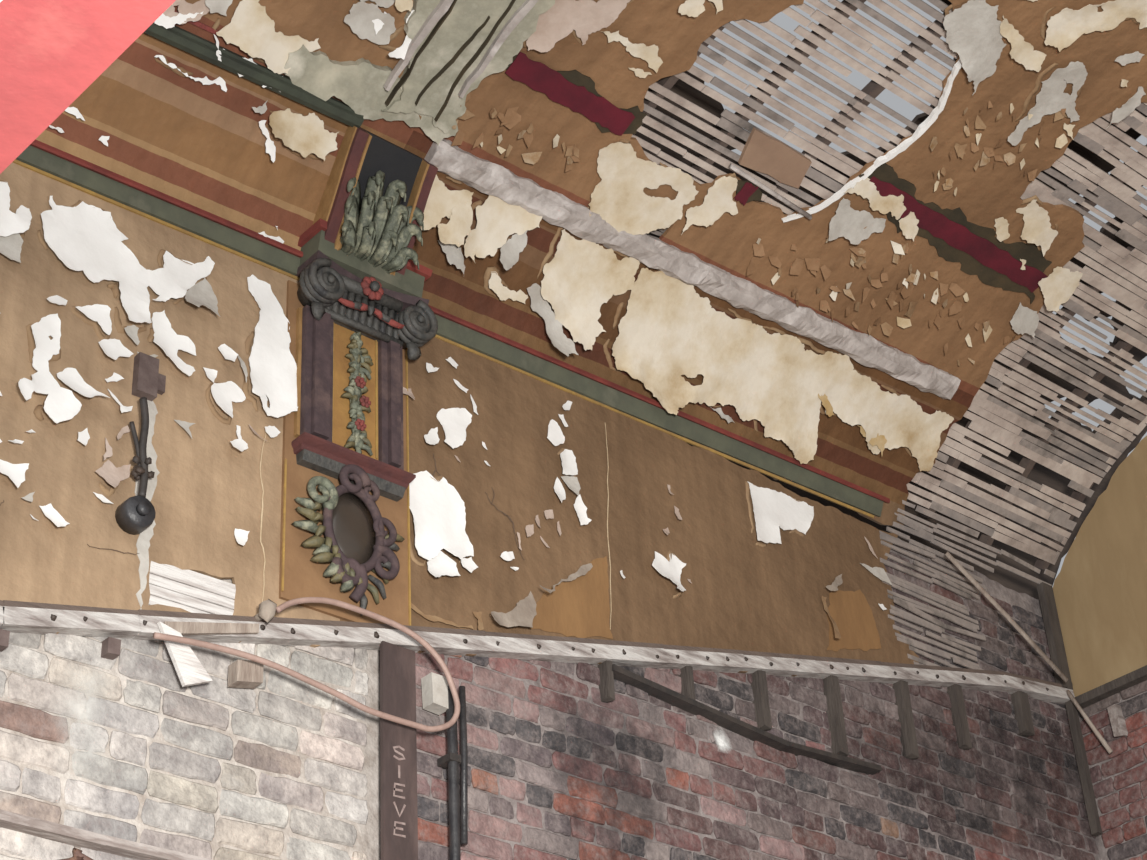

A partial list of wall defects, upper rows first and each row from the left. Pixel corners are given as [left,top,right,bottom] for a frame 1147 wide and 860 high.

peeling [154,0,321,74]
peeling [344,0,414,60]
peeling [252,85,339,163]
peeling [933,0,1147,196]
peeling [588,139,738,235]
peeling [0,180,298,504]
peeling [419,175,954,472]
peeling [747,177,1083,366]
peeling [409,471,478,577]
peeling [500,401,591,571]
peeling [652,550,692,599]
peeling [745,481,814,547]